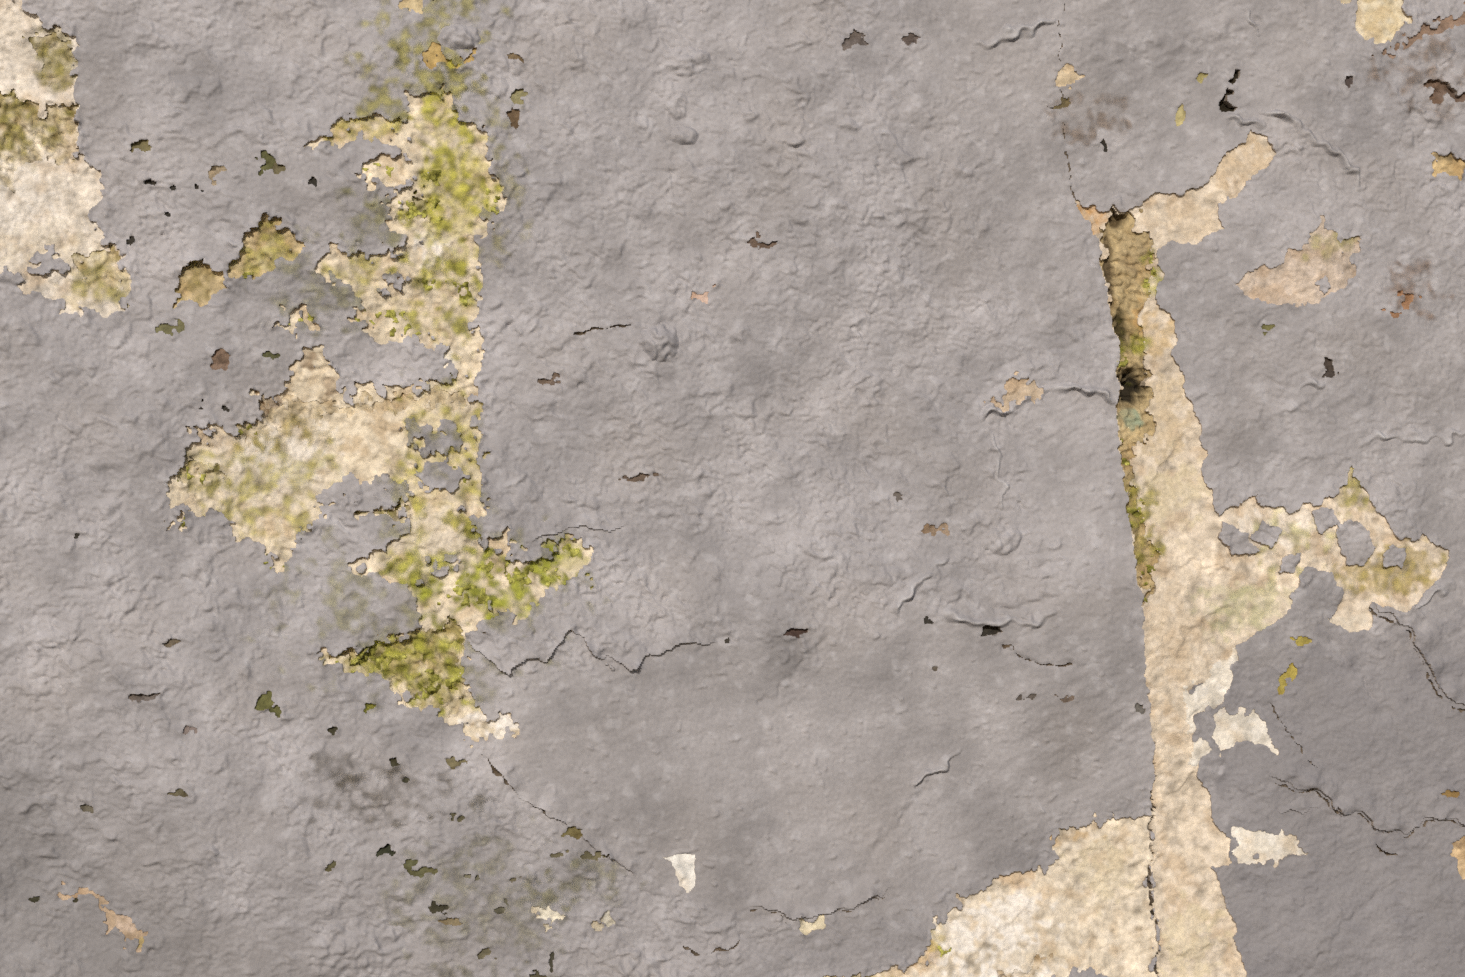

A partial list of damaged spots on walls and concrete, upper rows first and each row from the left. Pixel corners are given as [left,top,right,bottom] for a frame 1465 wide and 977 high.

peeling [398,0,434,14]
peeling [1340,0,1465,59]
peeling [0,0,135,318]
spalling [130,140,152,153]
peeling [155,42,732,893]
peeling [823,130,1465,977]
spalling [783,628,808,638]
peeling [747,873,895,935]
crack [1146,775,1159,974]